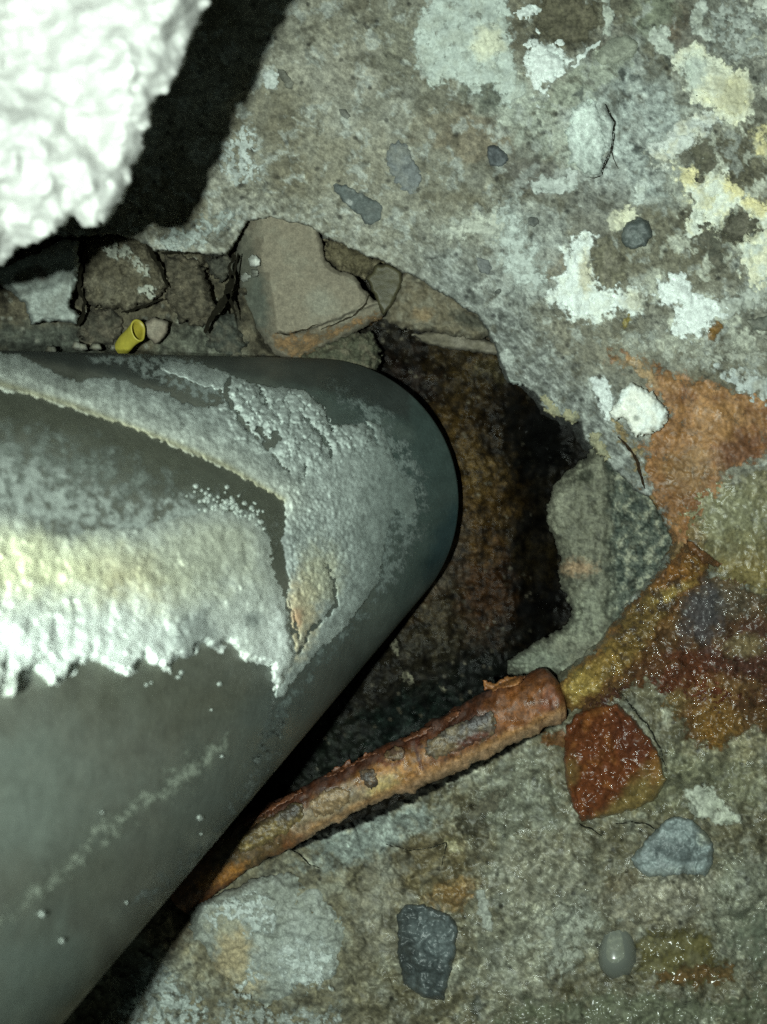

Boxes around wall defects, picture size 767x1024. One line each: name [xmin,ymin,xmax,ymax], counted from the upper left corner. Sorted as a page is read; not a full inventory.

crack [590,104,618,179]
water stain [412,0,767,407]
spalling [365,263,403,316]
rust [541,348,767,822]
rust [483,675,526,692]
rust [401,710,461,743]
rust [242,750,379,827]